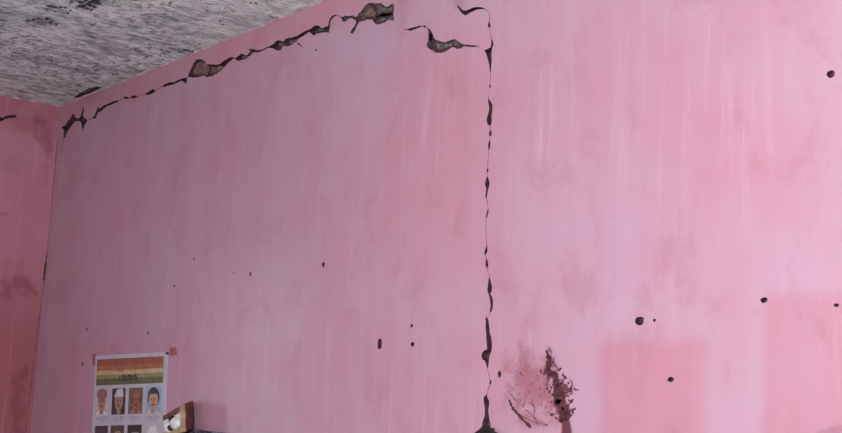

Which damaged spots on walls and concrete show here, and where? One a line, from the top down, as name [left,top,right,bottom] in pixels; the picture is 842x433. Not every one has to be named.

flaking render [340,3,394,34]
flaking render [404,25,480,53]
crack [0,114,16,122]
crack [25,15,340,433]
crack [457,6,548,429]